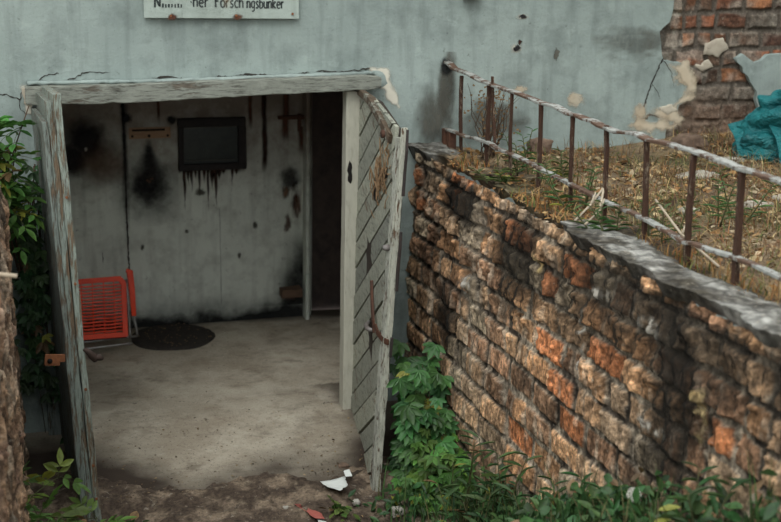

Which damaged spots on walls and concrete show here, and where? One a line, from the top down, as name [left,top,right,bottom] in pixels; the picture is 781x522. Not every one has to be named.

spalling [370,68,399,107]
crack [643,58,674,119]
spalling [630,0,781,136]